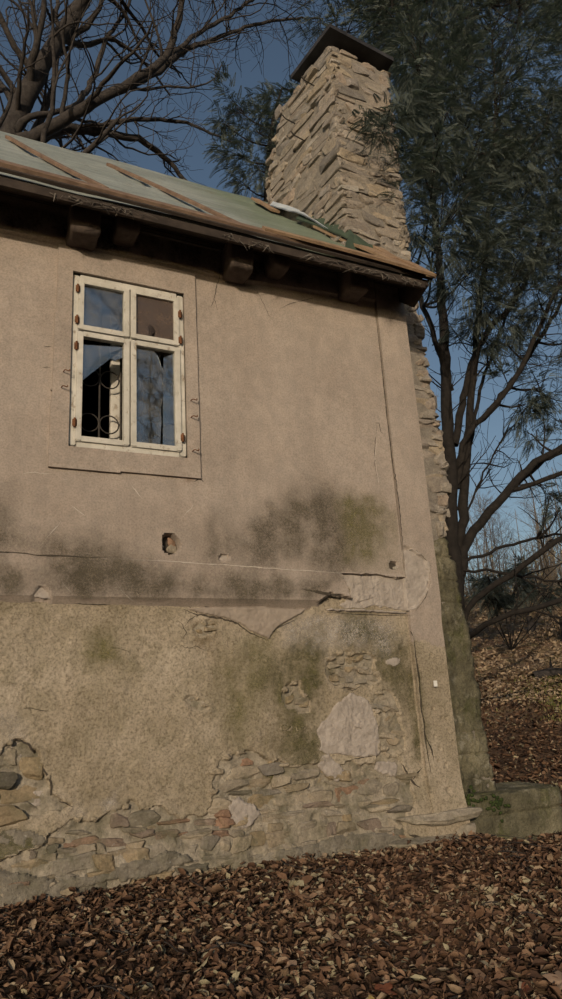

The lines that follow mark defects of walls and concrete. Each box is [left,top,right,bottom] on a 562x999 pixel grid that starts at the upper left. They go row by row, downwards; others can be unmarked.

crack [0,316,434,788]
leakage [254,497,347,568]
flaking render [327,548,431,614]
spalling [0,649,419,908]